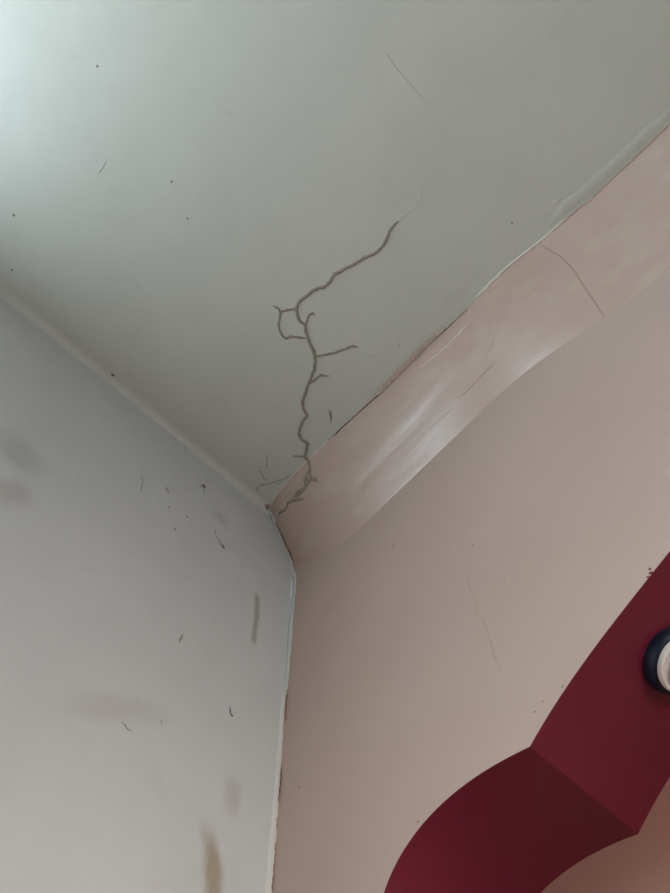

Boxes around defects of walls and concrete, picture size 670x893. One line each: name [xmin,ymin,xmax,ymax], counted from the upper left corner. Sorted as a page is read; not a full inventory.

crack [540,125,669,316]
crack [256,221,398,563]
crack [330,309,468,439]
crack [272,767,282,891]